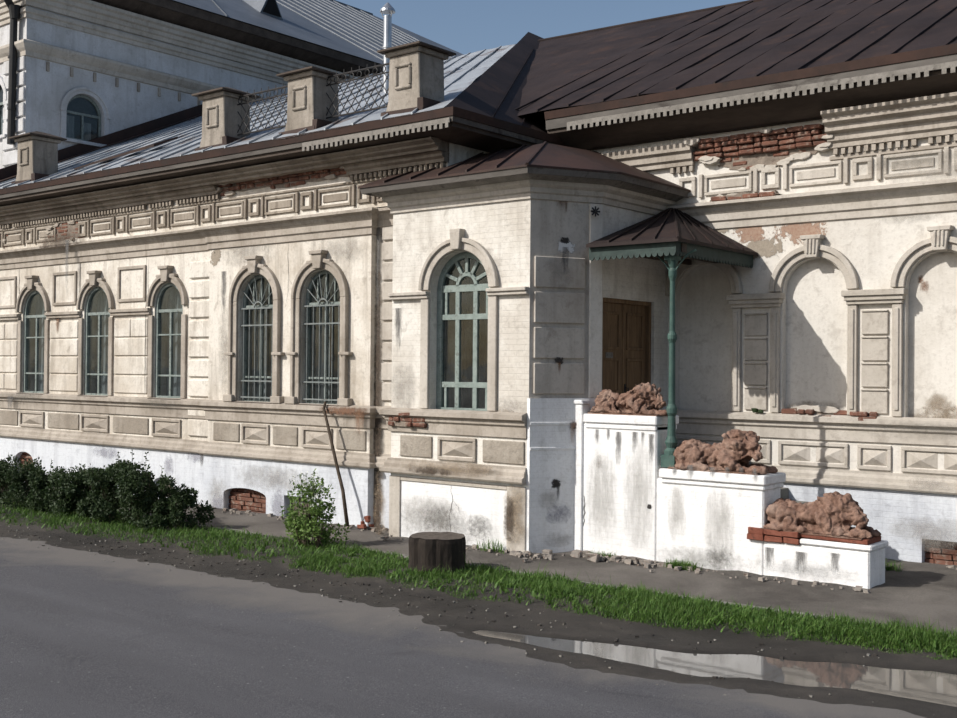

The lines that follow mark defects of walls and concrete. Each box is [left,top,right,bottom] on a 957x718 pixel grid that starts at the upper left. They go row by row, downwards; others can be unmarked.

spalling [683,124,834,171]
spalling [215,166,350,196]
spalling [710,190,782,202]
peeling [716,222,827,259]
spalling [387,413,428,428]